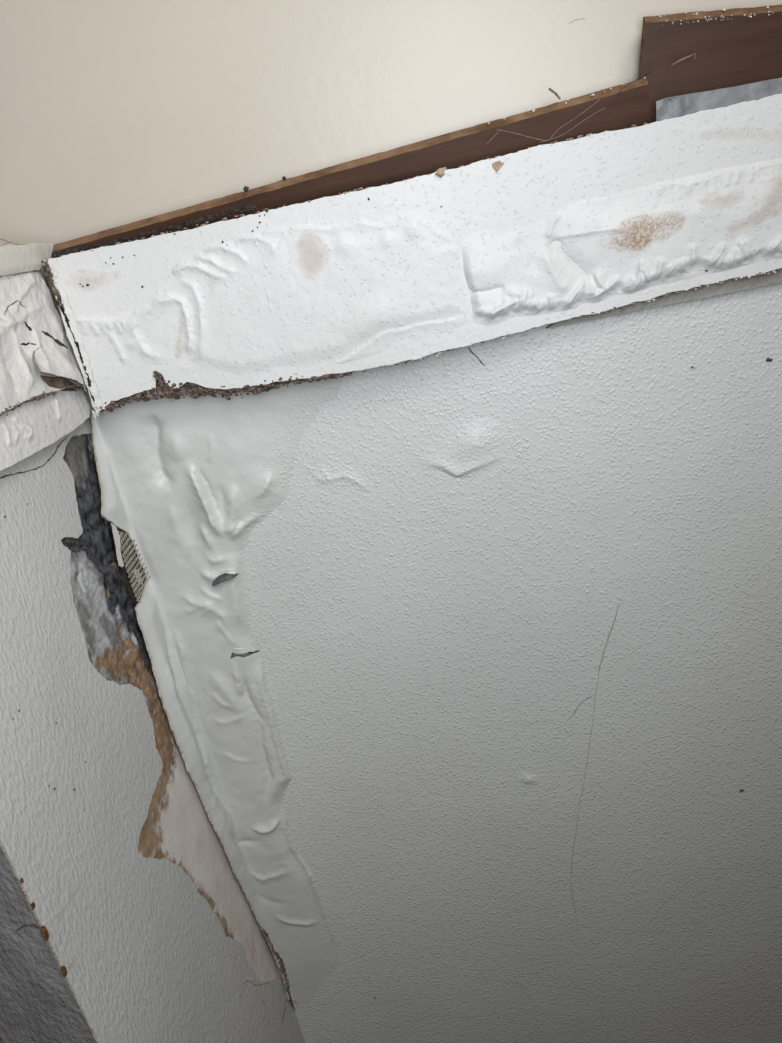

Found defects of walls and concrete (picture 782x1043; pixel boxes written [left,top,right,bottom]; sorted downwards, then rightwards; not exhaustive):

peeling [0,271,88,416]
peeling [61,371,353,1003]
crack [567,590,626,927]